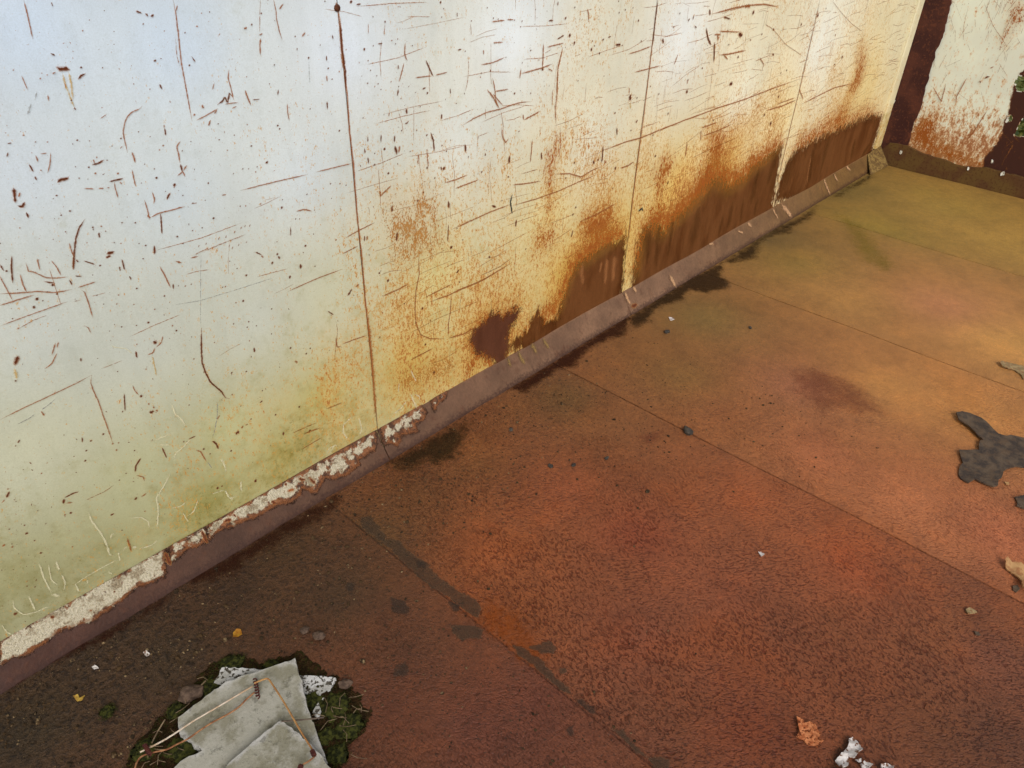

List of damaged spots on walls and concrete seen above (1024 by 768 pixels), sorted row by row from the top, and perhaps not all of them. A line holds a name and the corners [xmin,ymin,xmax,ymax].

corrosion [332,3,882,413]
water stain [507,113,884,392]
corrosion [911,70,1024,177]
peeling [0,390,449,666]
water stain [392,427,467,468]